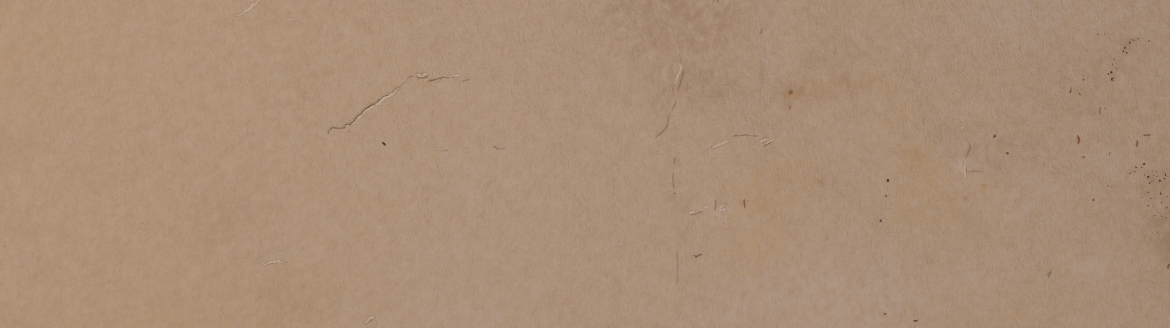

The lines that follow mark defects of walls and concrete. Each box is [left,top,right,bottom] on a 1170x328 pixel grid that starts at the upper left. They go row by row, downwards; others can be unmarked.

crack [328,73,460,138]